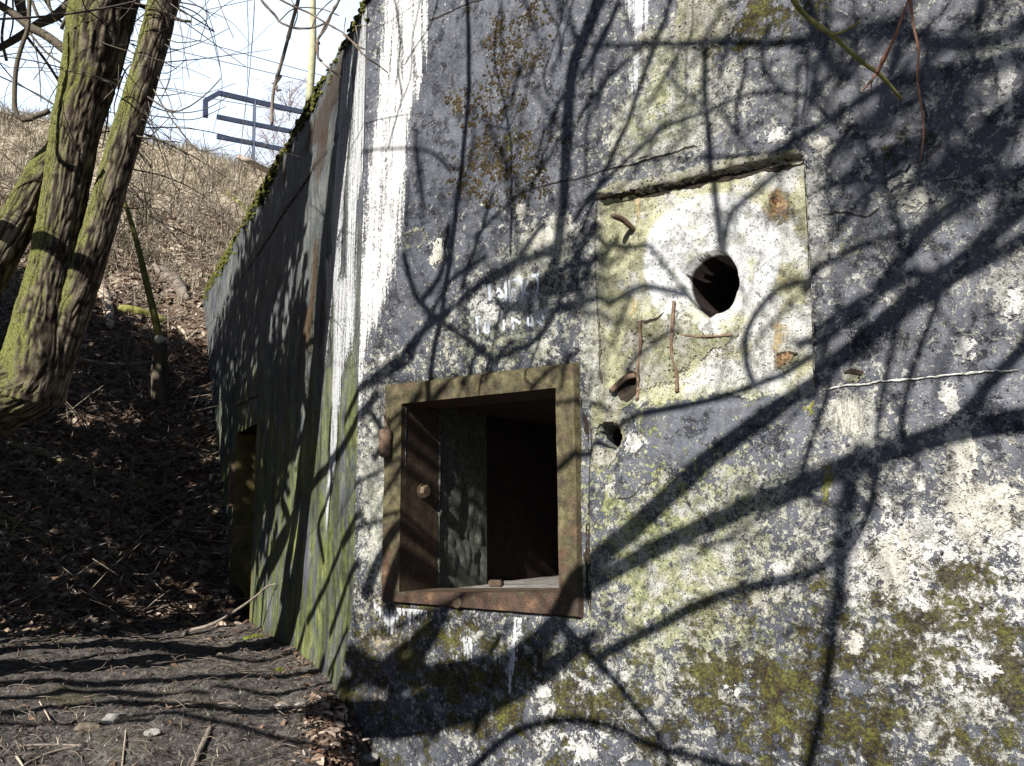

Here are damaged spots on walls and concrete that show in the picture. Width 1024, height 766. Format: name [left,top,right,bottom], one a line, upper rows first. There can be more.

spalling [590,309,745,470]
crack [523,145,1013,390]
rust [762,187,791,220]
rust [772,316,793,367]